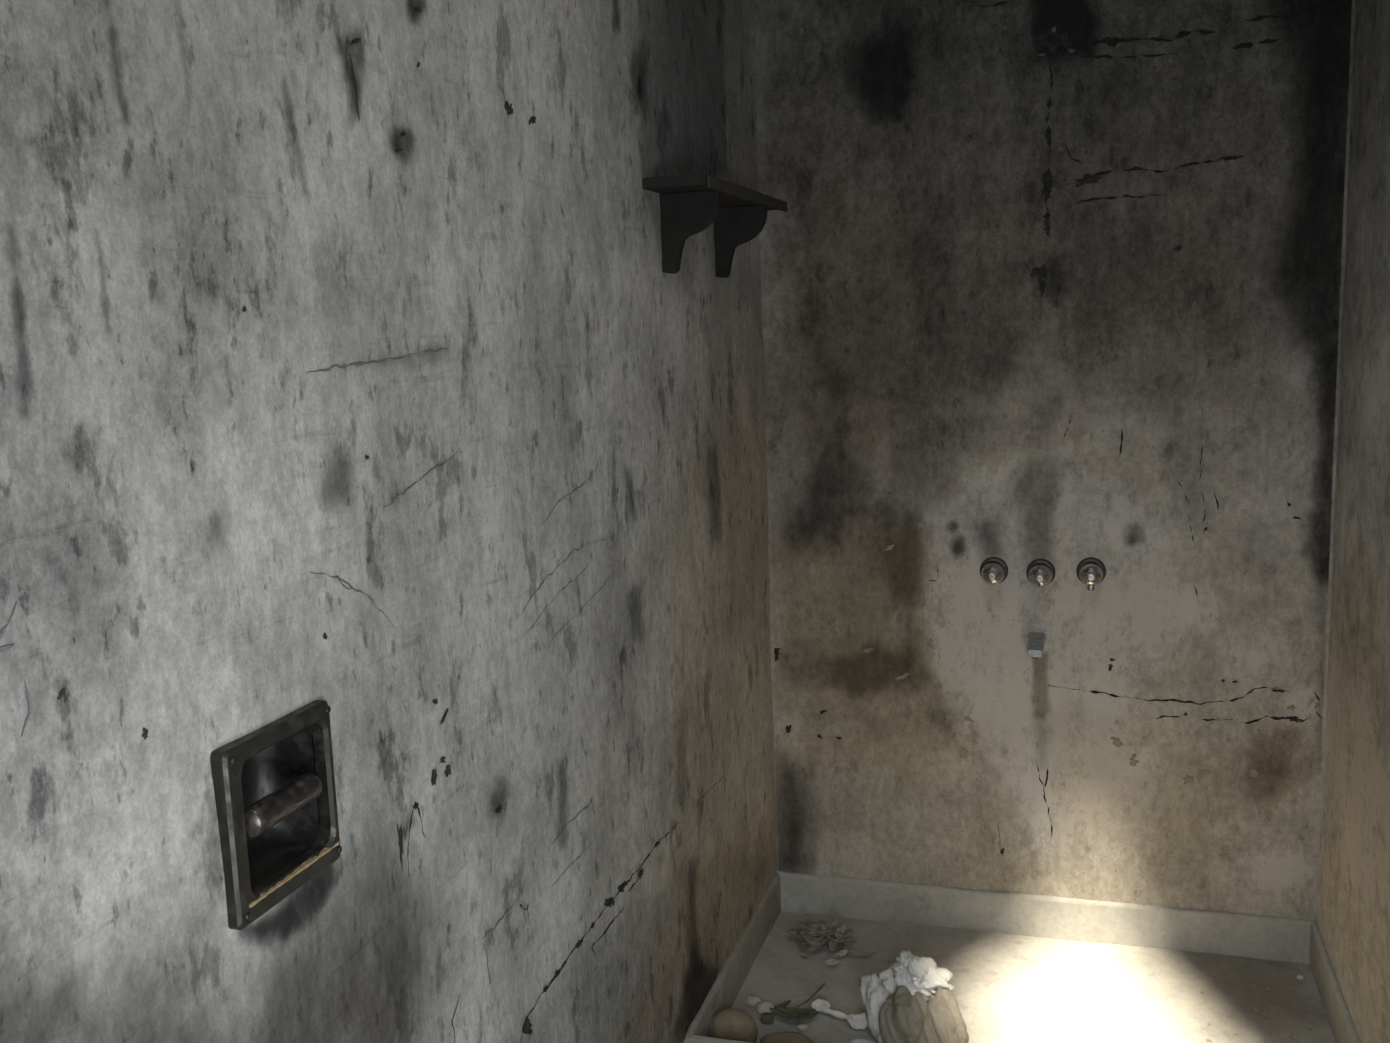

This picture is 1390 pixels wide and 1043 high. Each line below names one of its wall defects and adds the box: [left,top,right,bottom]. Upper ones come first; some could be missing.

crack [1036,7,1315,237]
crack [1049,679,1322,724]
crack [452,945,491,1043]
crack [520,826,676,1043]